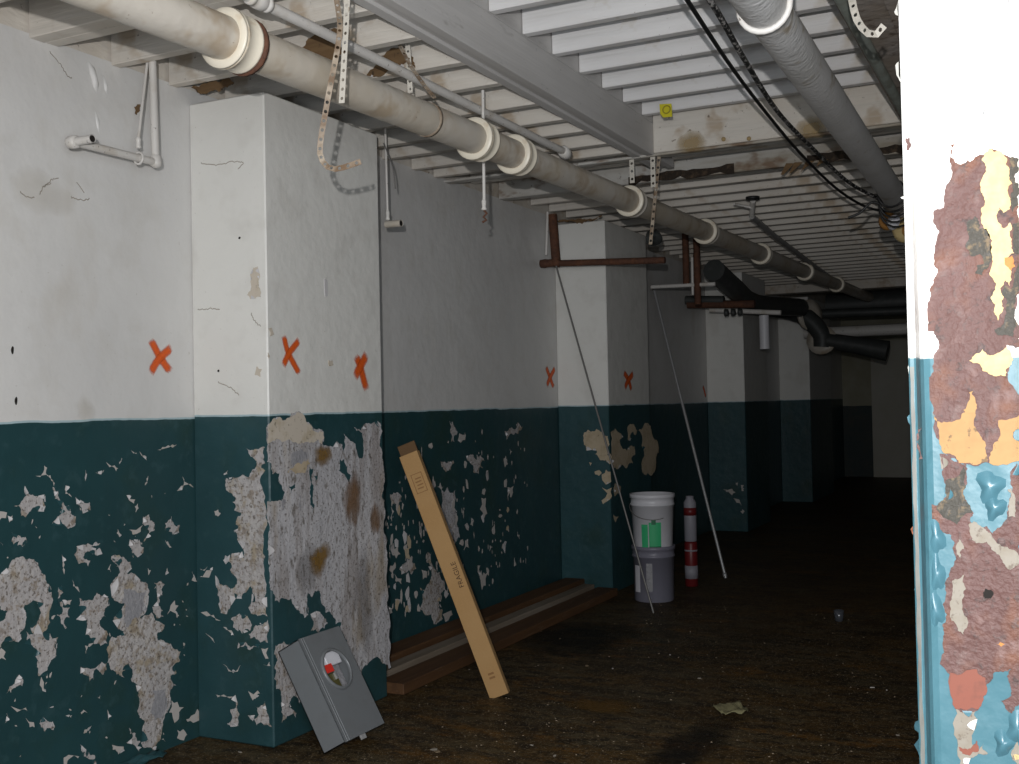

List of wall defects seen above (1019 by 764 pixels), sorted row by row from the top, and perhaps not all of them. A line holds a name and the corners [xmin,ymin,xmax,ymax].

rust [684,296,756,308]
peeling [0,466,199,754]
peeling [187,411,453,721]
peeling [432,421,528,589]
peeling [583,423,659,504]
peeling [907,365,925,764]
peeling [927,144,1019,764]
peeling [64,744,96,764]
peeling [217,691,272,727]